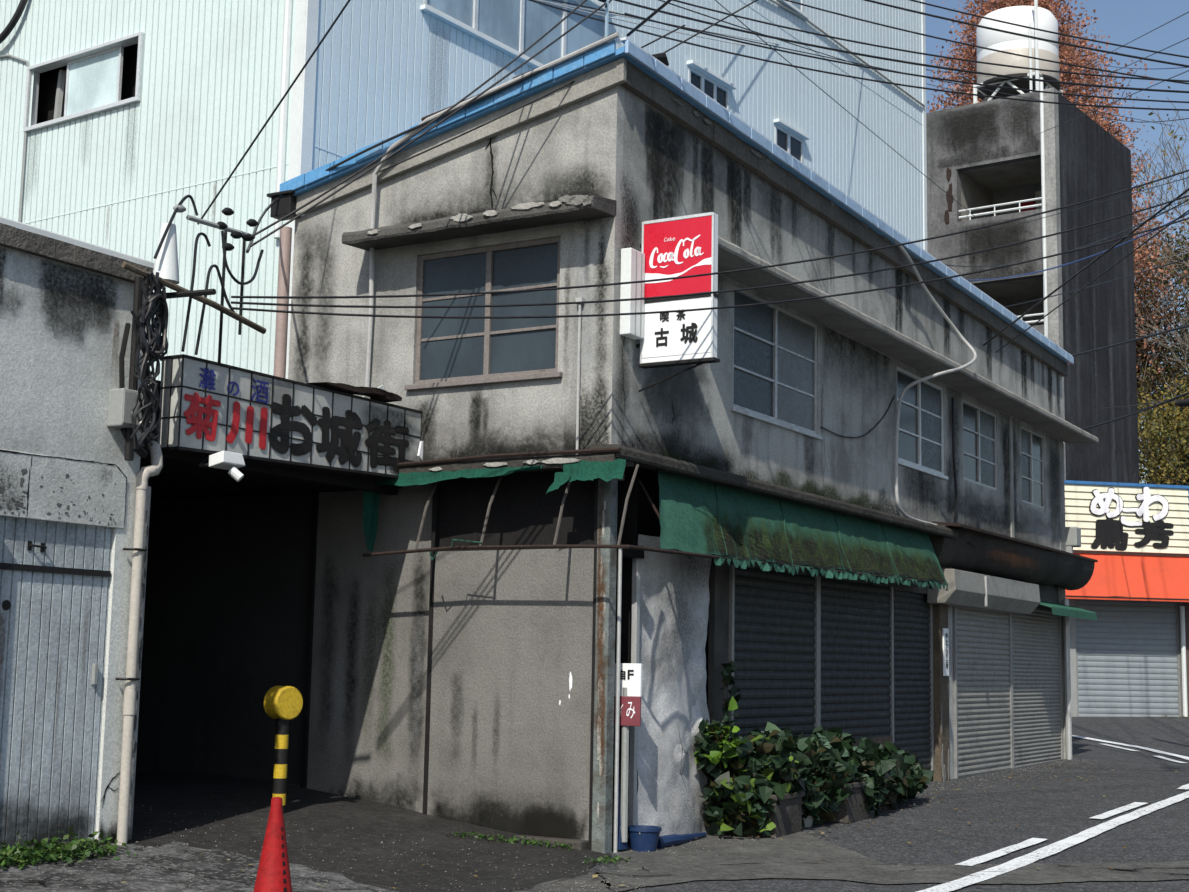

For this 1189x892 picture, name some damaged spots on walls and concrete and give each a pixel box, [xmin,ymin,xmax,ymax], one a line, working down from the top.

crack [485,137,497,210]
water stain [623,185,639,248]
water stain [646,110,713,219]
water stain [727,162,750,247]
water stain [42,263,116,334]
water stain [585,243,608,351]
water stain [564,361,627,455]
water stain [621,365,730,471]
rust [597,530,605,762]